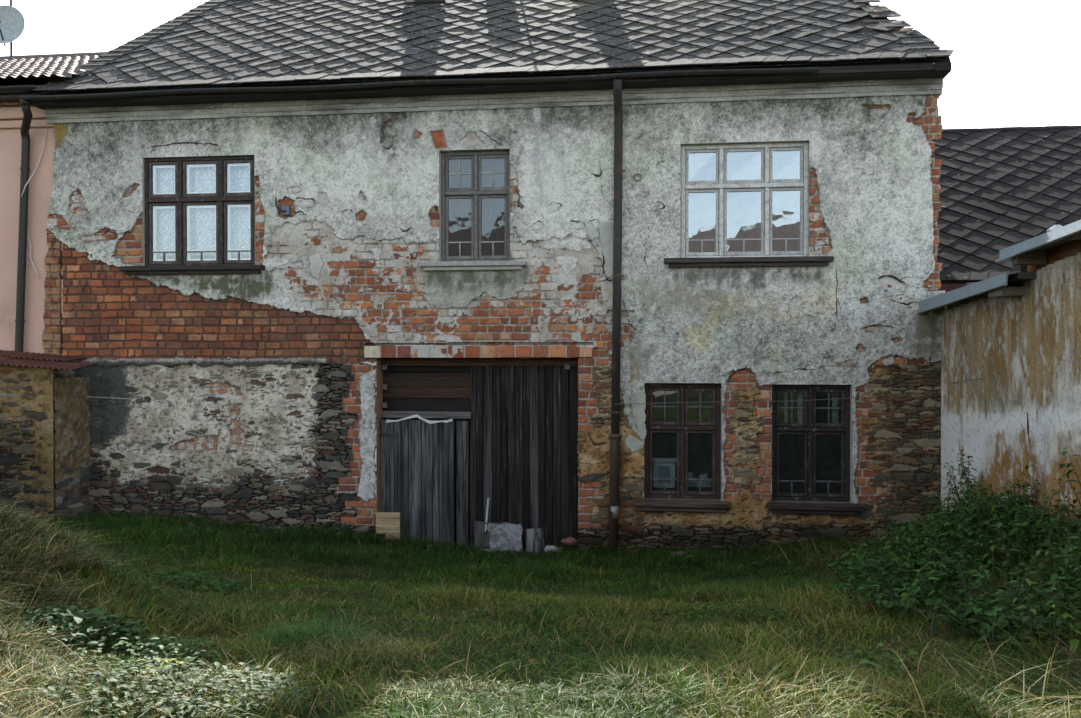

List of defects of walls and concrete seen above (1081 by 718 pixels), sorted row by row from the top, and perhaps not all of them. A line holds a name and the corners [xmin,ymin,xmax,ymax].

flaking render [413,129,448,148]
flaking render [907,95,943,291]
flaking render [42,163,942,553]